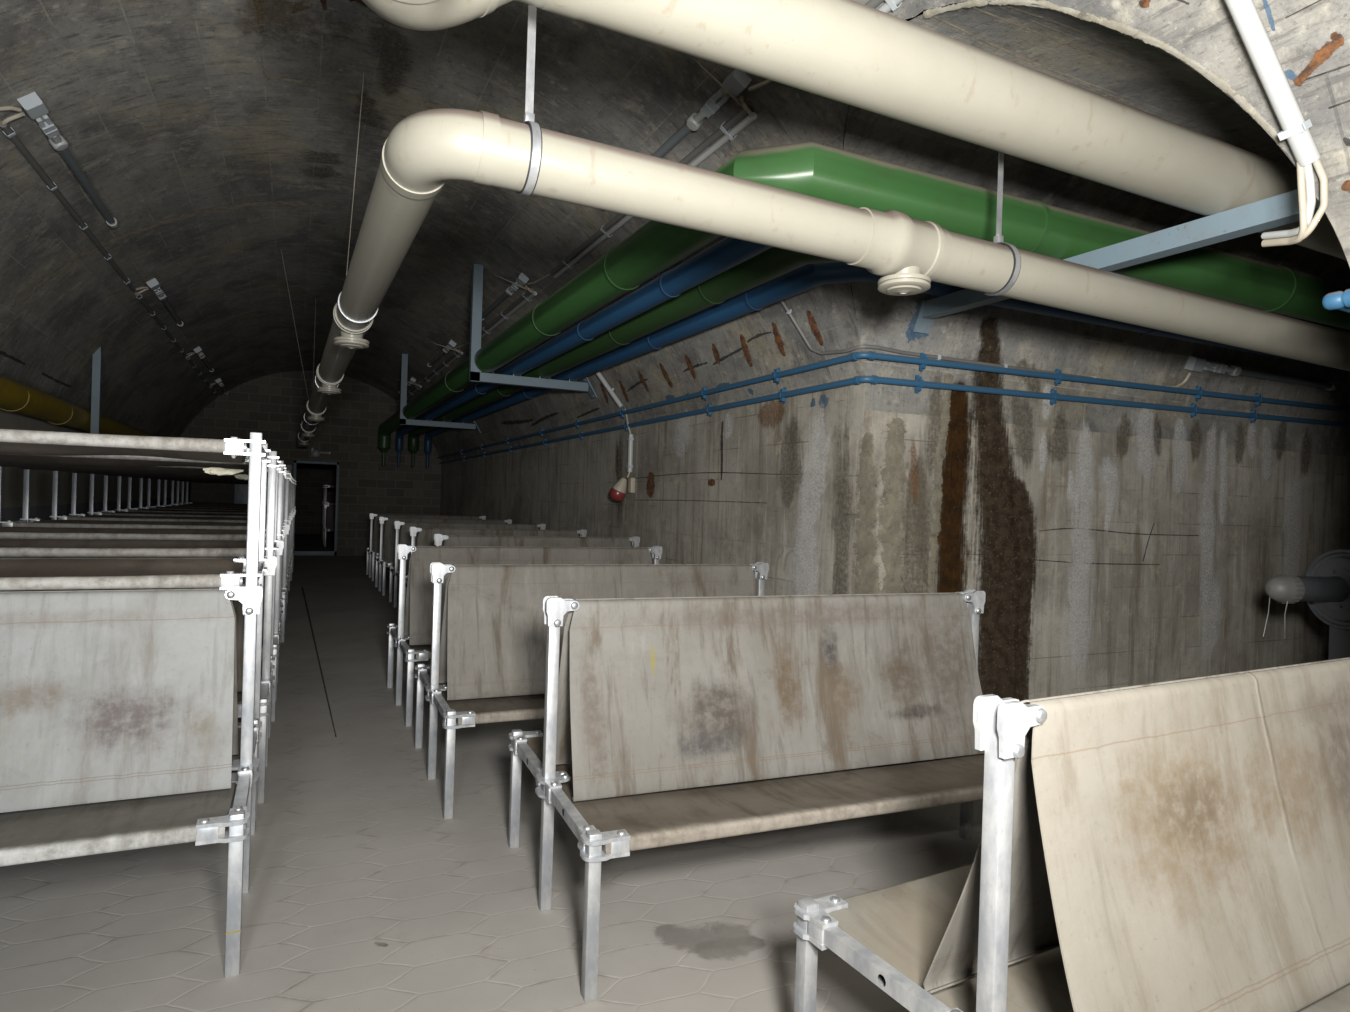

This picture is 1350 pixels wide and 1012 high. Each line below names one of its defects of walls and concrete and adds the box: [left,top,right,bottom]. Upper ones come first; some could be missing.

corrosion [1293,32,1344,87]
corrosion [740,334,752,367]
corrosion [772,322,786,356]
damp [902,317,1286,701]
damp [657,925,764,958]